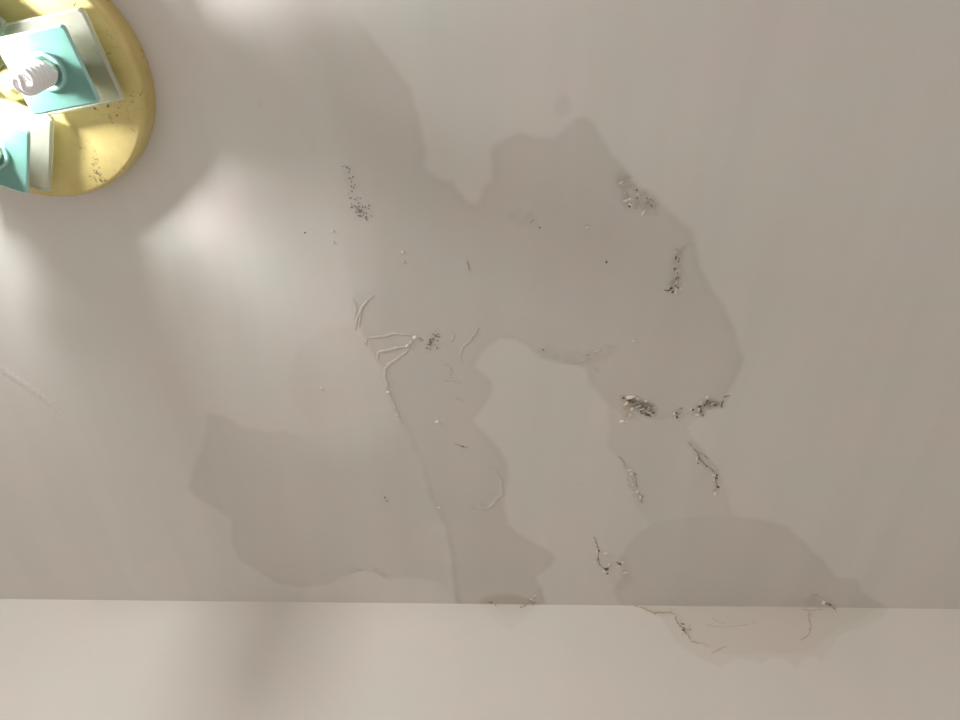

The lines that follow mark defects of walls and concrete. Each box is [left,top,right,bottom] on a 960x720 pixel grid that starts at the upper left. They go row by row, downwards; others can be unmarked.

spalling [619,395,656,423]
crack [619,457,644,503]
crack [689,443,719,496]
crack [593,540,627,595]
crack [635,606,756,653]